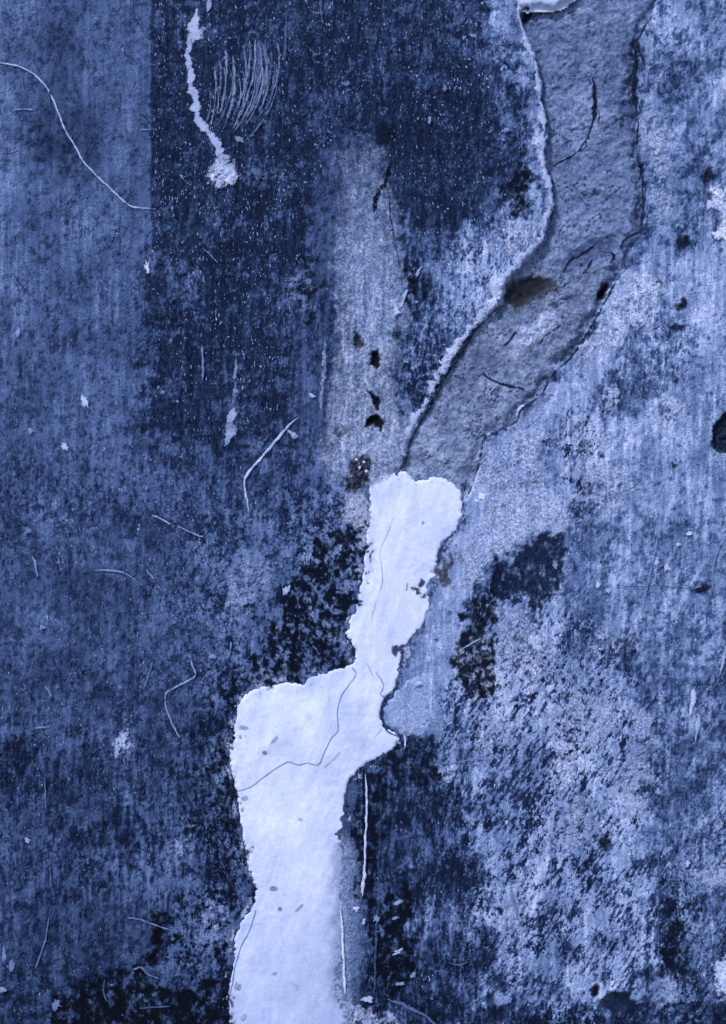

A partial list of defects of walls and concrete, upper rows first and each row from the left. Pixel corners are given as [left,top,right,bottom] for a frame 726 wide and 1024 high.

crack [403,16,652,498]
spalling [353,331,381,369]
flaking render [399,0,672,695]
spalling [364,391,385,432]
peeling [228,560,269,614]
peeling [438,764,458,783]
peeling [342,781,359,842]
peeling [341,1000,397,1024]